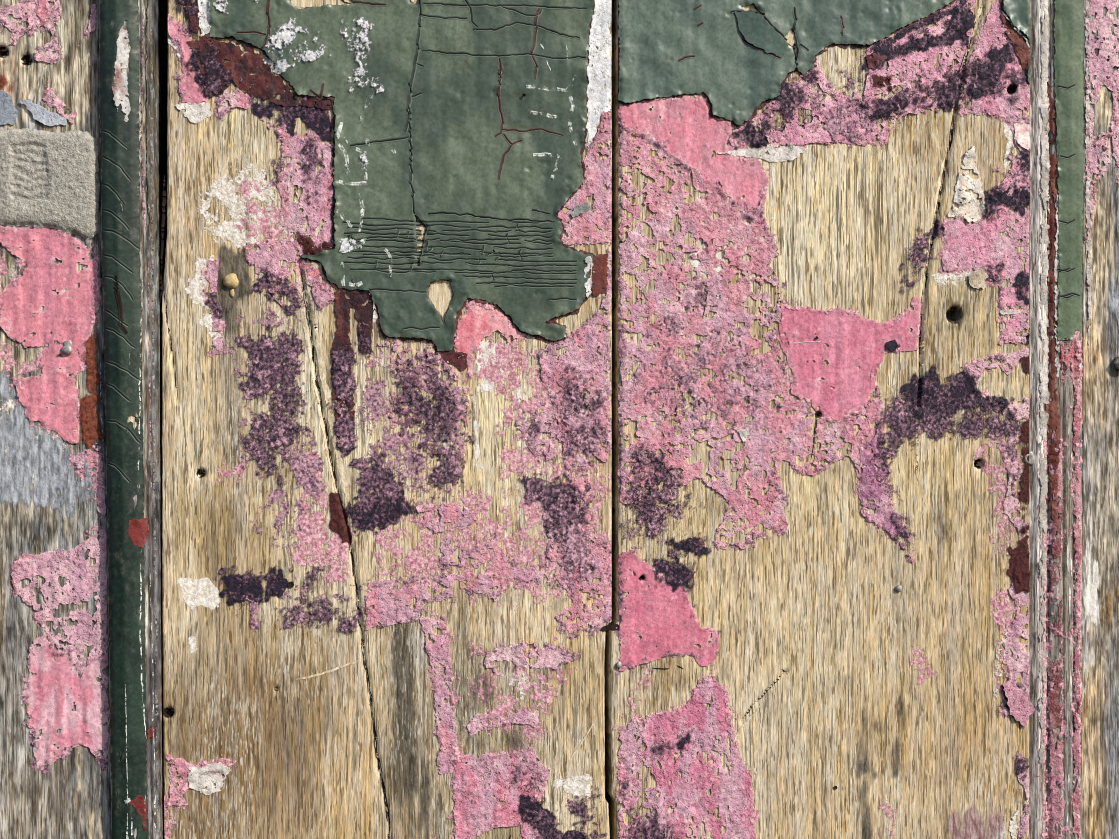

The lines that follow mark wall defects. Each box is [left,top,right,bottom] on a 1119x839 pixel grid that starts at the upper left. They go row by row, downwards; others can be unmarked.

crack [237,0,272,51]
crack [309,83,326,100]
crack [336,0,587,302]
peeling [0,0,155,839]
crack [299,263,339,493]
crack [402,324,440,332]
peeling [164,0,1031,839]
crack [347,530,390,839]